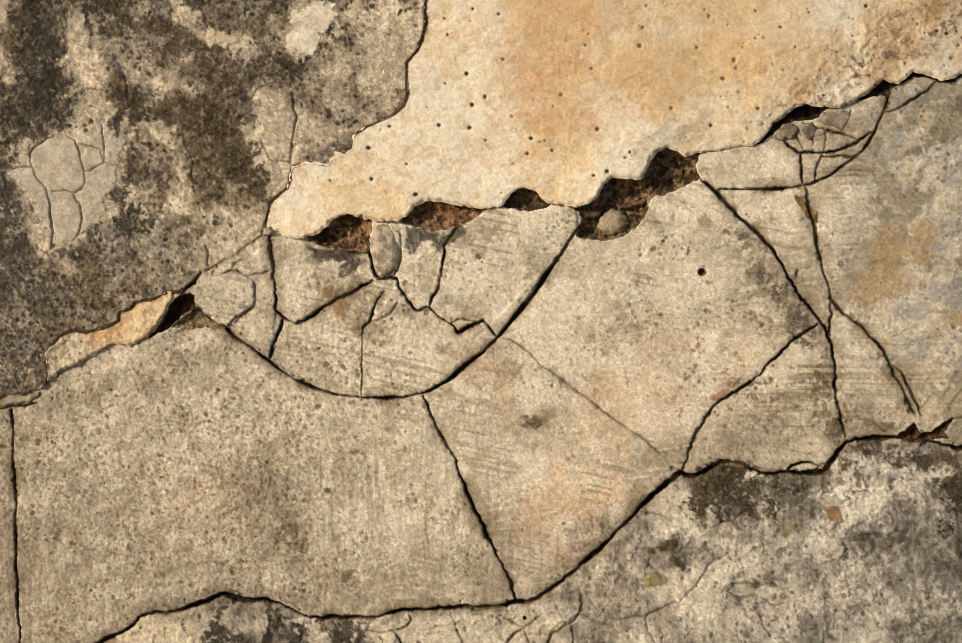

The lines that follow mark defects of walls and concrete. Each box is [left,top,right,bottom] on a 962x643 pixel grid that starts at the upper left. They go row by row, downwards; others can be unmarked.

water stain [0,173,84,313]
crack [30,129,117,248]
water stain [109,142,157,238]
water stain [0,0,306,202]
water stain [315,22,348,54]
flaking render [263,0,962,252]
flaking render [0,290,226,406]
crack [100,72,962,643]
water stain [723,227,962,561]
crack [0,403,35,643]
water stain [678,459,809,528]
water stain [200,602,367,643]